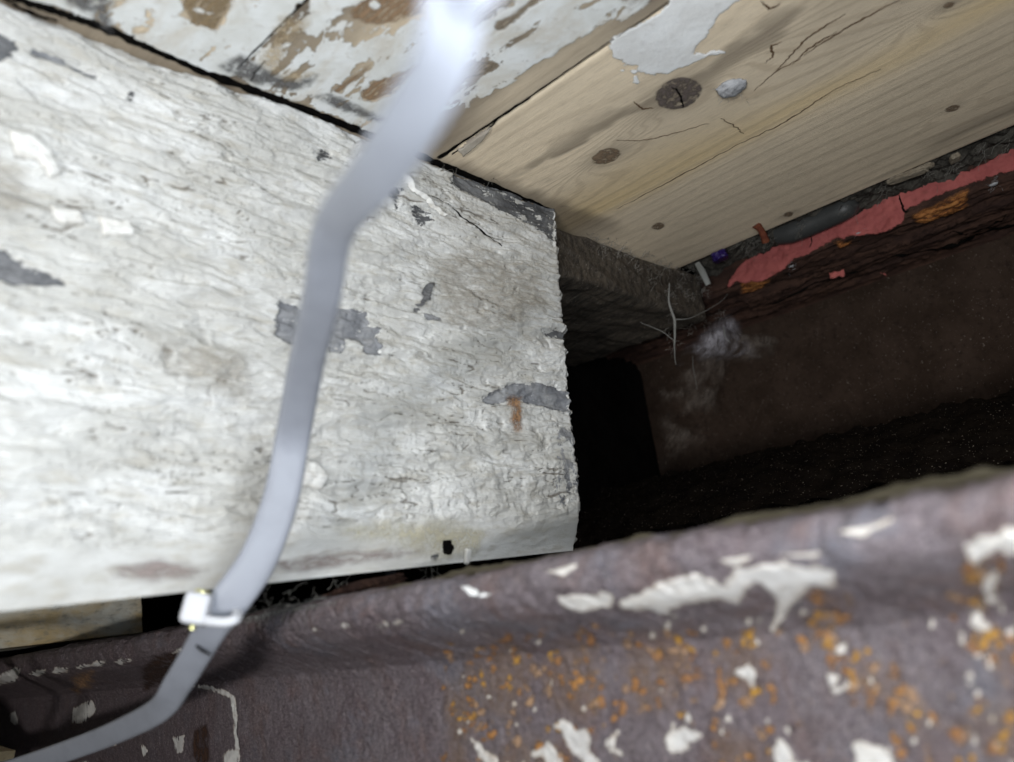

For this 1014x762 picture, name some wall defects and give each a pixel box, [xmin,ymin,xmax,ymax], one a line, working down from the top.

peeling [31,0,421,131]
peeling [457,0,739,108]
crack [754,0,899,91]
crack [617,69,880,207]
peeling [451,172,556,241]
peeling [0,250,66,286]
peeling [329,309,383,356]
rust [511,398,522,431]
rust [449,624,703,748]
rust [710,628,756,748]
rust [796,590,937,734]
rust [966,628,1014,666]